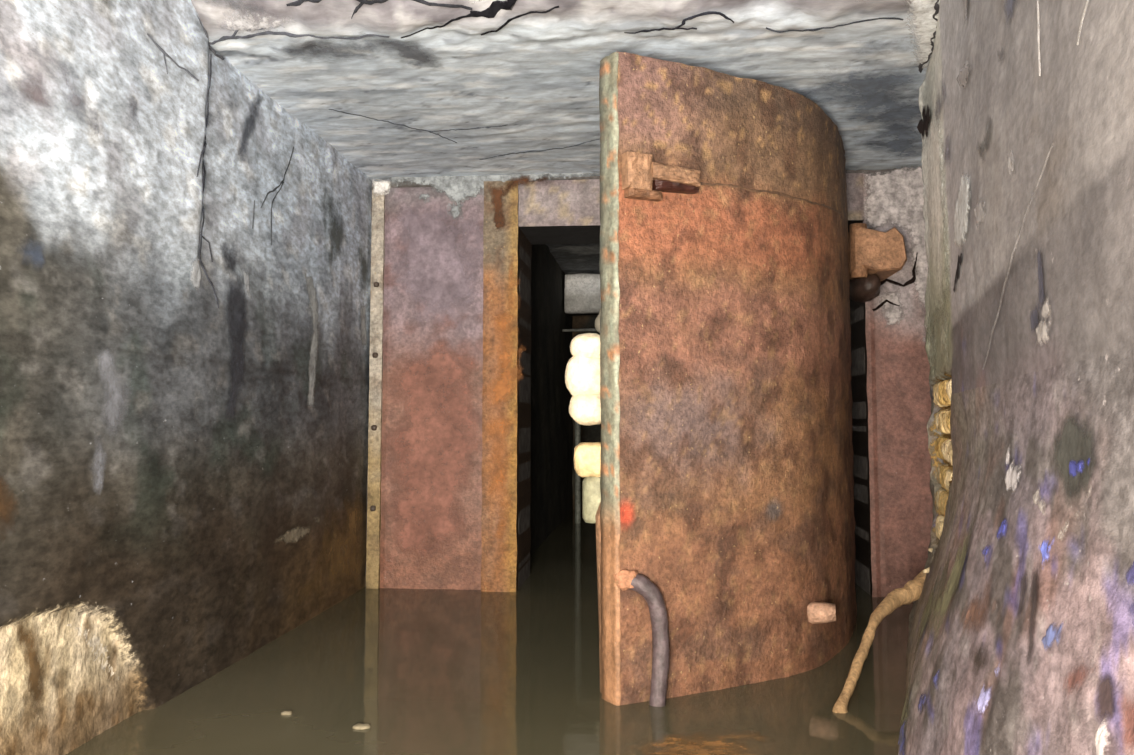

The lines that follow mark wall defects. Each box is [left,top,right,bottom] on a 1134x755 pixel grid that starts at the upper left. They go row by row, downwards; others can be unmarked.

crack [624,11,734,34]
crack [766,17,903,33]
peeling [907,0,940,69]
crack [918,0,939,73]
crack [917,105,931,138]
crack [147,0,559,308]
crack [479,139,599,160]
corrosion [492,176,530,229]